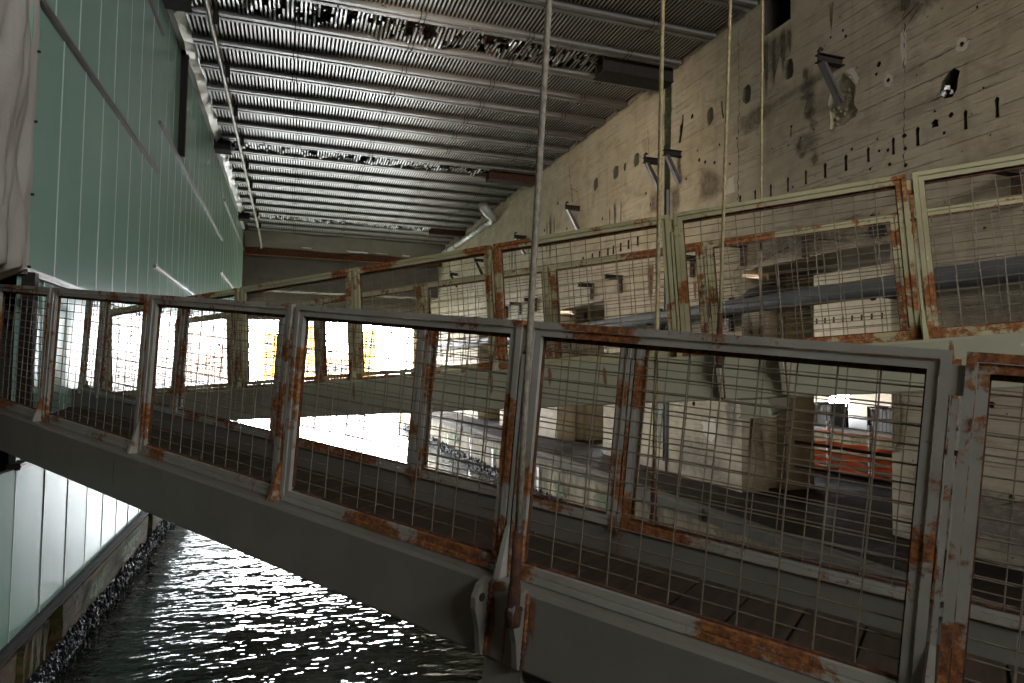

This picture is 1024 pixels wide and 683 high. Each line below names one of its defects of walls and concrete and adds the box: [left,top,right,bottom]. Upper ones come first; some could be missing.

damp [764,32,791,89]
damp [797,70,817,164]
spalling [827,72,858,131]